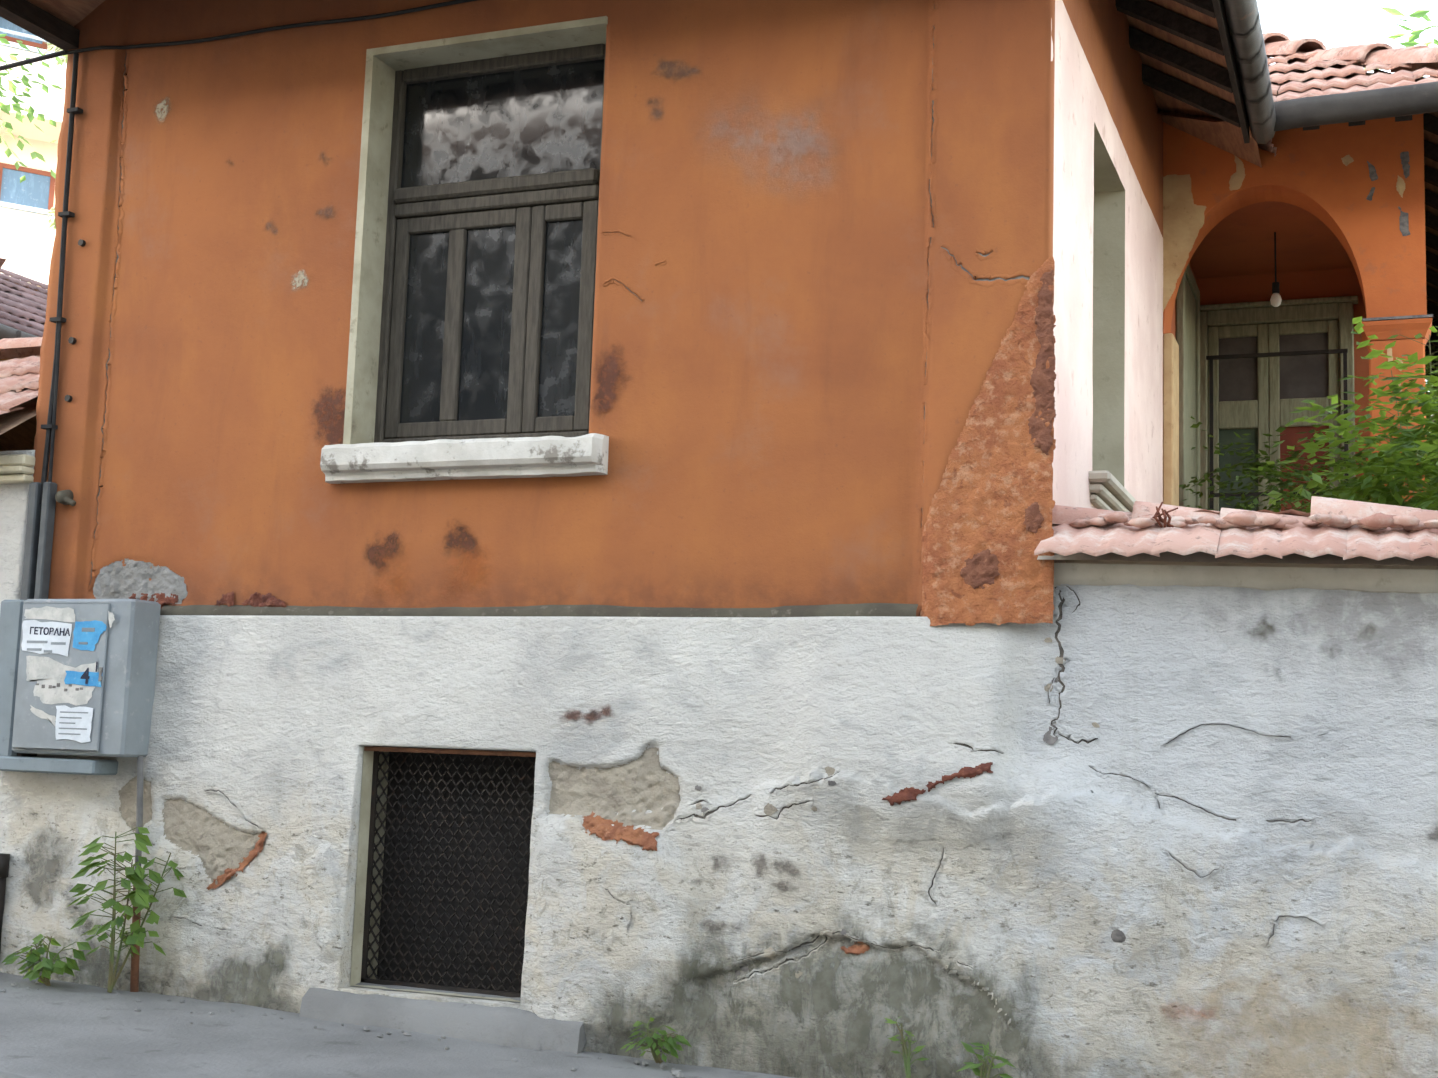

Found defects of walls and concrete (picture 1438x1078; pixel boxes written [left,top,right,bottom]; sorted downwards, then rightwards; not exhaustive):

peeling [1163,174,1207,312]
spalling [920,257,1056,626]
corrosion [367,533,399,569]
corrosion [446,527,476,553]
spalling [118,775,267,890]
peeling [548,744,681,851]
crack [673,766,841,825]
damp [755,855,799,891]
crack [953,738,1006,758]
crack [1043,584,1327,828]
crack [1264,911,1326,948]
damp [595,924,1044,1078]